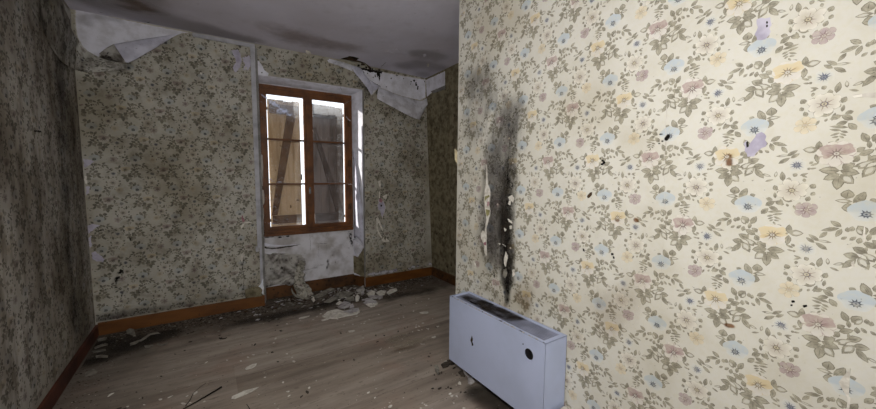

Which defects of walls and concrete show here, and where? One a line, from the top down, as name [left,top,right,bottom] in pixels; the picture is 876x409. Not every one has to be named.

flaking render [74,10,188,57]
flaking render [327,59,445,101]
water stain [463,107,523,320]